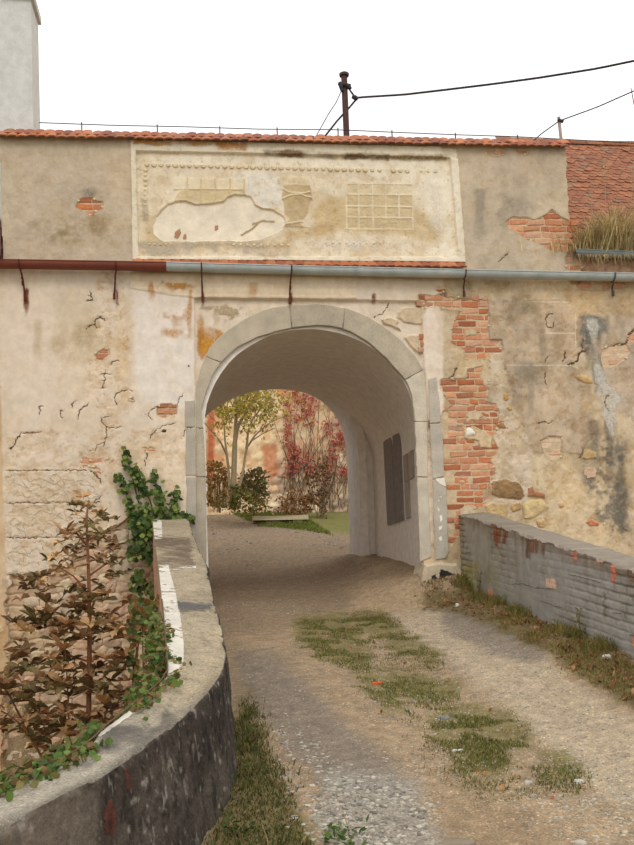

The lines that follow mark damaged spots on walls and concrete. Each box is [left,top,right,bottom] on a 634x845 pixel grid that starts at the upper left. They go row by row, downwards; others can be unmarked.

flaking render [75,197,104,217]
flaking render [505,209,584,272]
flaking render [576,281,629,291]
flaking render [94,348,110,362]
water stain [580,316,607,349]
flaking render [601,329,634,368]
flaking render [156,403,177,418]
flaking render [381,285,564,554]
water stain [593,359,624,465]
flaking render [79,448,114,477]
water stain [585,471,628,533]